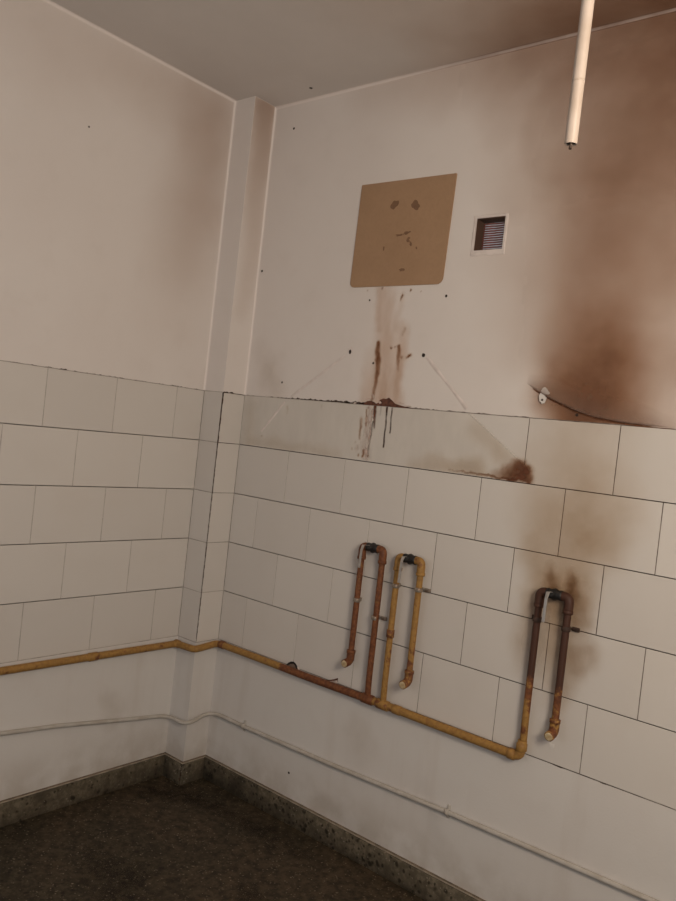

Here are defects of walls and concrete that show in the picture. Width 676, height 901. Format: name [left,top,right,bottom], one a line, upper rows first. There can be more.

corrosion [499,461,531,483]